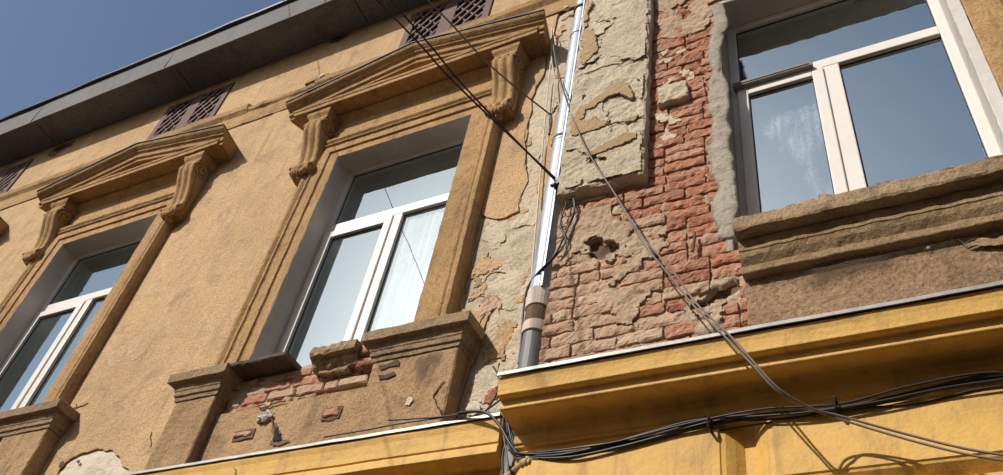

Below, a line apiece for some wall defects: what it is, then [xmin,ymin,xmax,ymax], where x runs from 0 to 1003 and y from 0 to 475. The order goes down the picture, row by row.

flaking render [456,0,748,419]
flaking render [227,364,372,412]
flaking render [320,406,343,422]
flaking render [232,428,256,443]
flaking render [269,423,290,446]
flaking render [58,450,129,475]